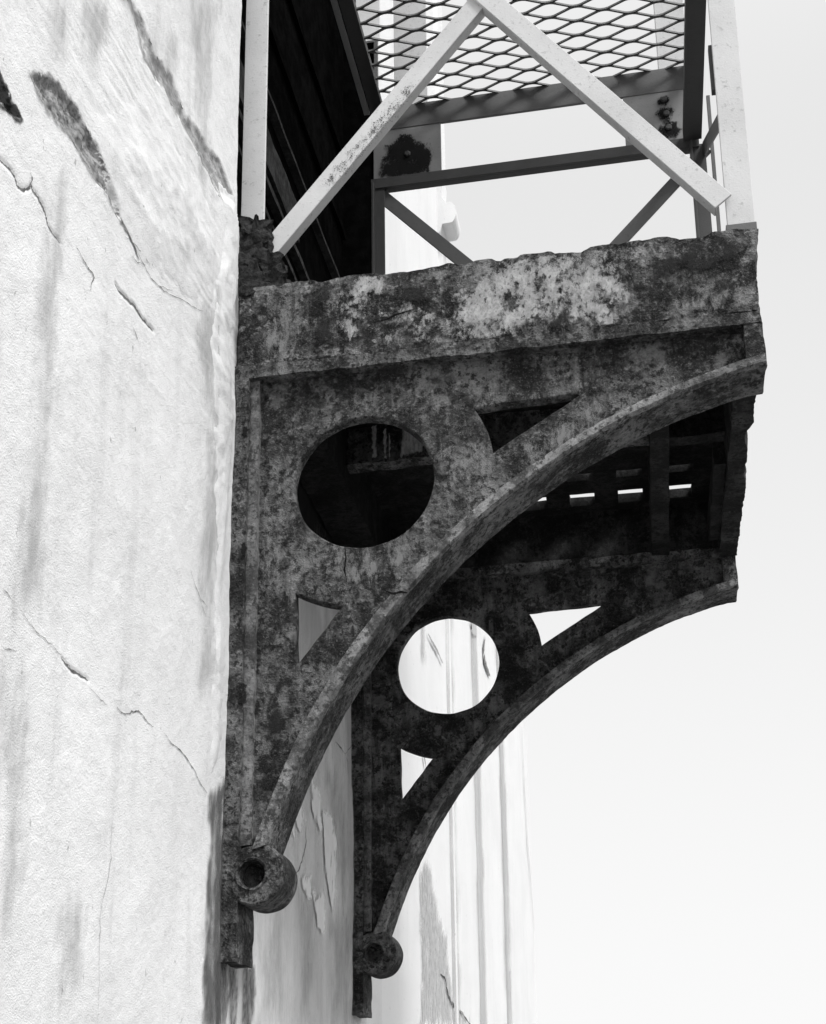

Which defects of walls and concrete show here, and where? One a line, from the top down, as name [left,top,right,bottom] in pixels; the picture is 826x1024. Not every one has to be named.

corrosion [378,134,432,177]
corrosion [656,96,682,138]
crack [0,160,152,345]
crack [5,591,205,790]
corrosion [204,780,256,1024]
peeling [291,779,337,933]